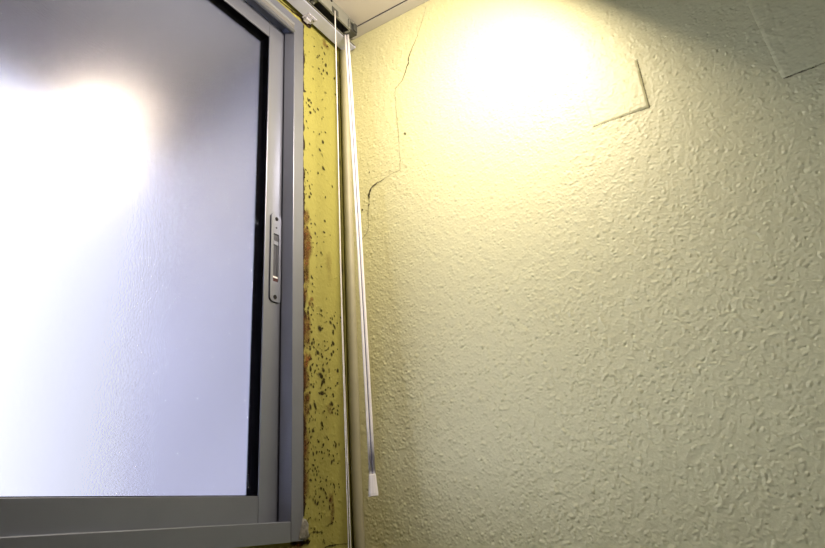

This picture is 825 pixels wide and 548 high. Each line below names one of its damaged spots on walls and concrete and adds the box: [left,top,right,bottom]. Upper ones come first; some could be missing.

damp [304,256,349,544]